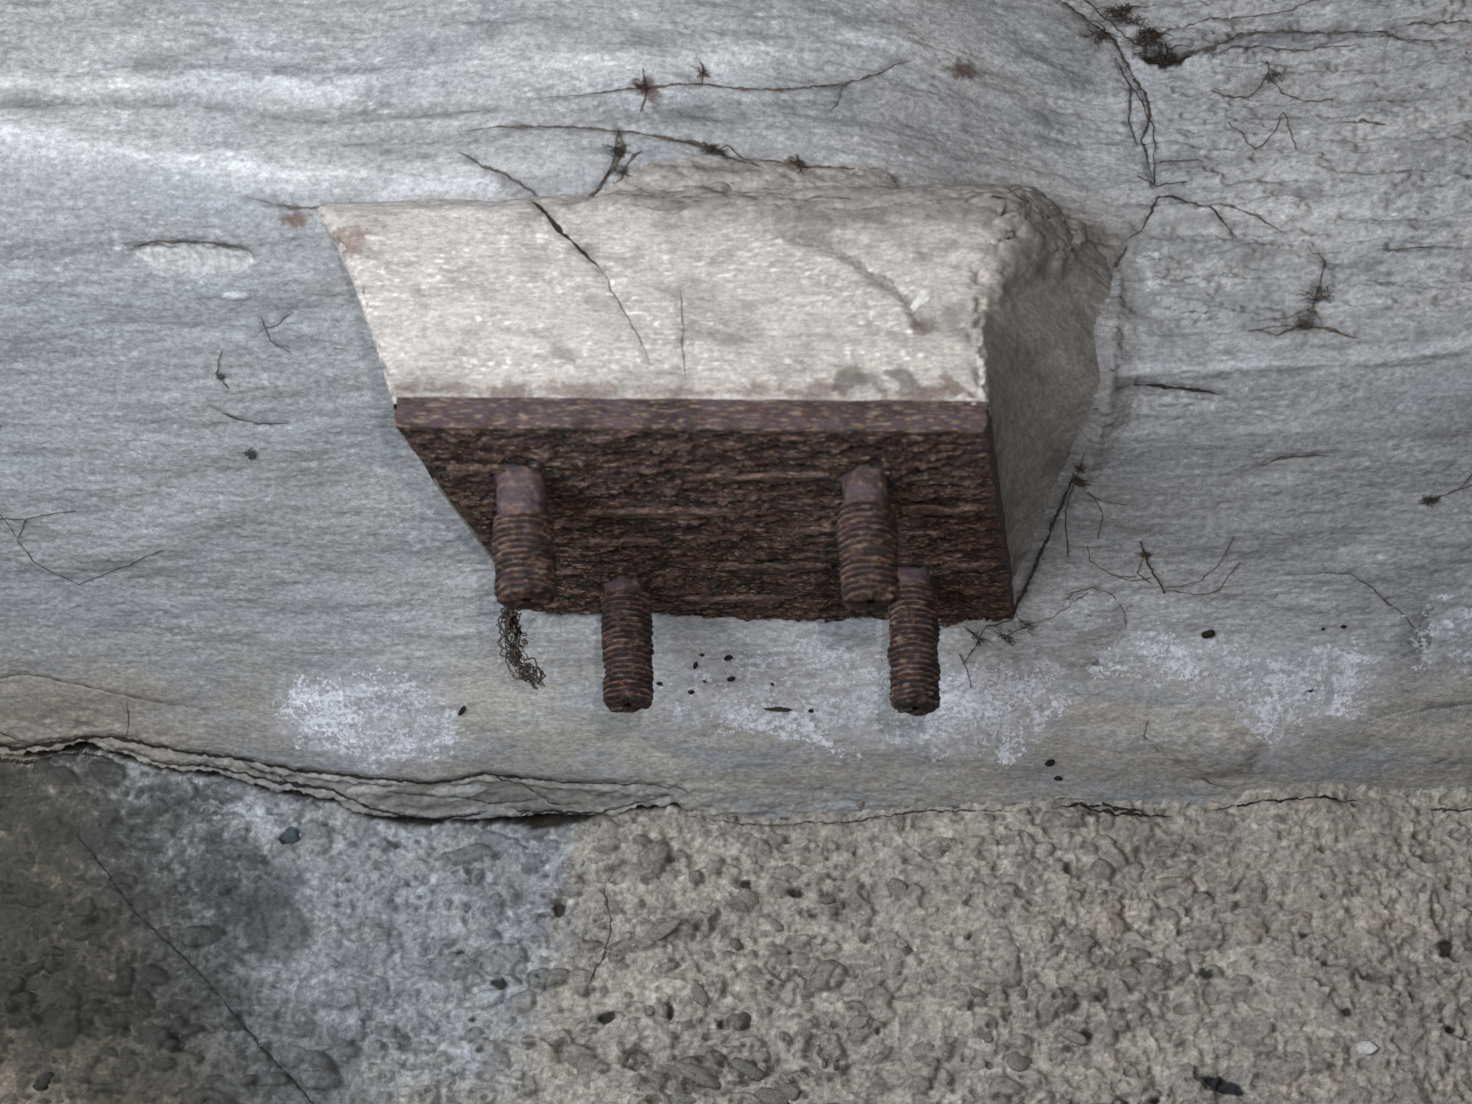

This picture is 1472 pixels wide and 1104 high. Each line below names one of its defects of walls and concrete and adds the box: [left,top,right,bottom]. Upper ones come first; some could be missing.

crack [458,59,913,381]
crack [1059,0,1471,338]
crack [1133,384,1221,395]
corrosion [446,464,506,477]
corrosion [586,506,736,520]
corrosion [699,471,833,483]
corrosion [903,504,980,517]
damp [268,666,469,774]
crack [0,673,1172,826]
damp [645,613,1412,768]
crack [1209,794,1366,811]
damp [0,753,259,1104]